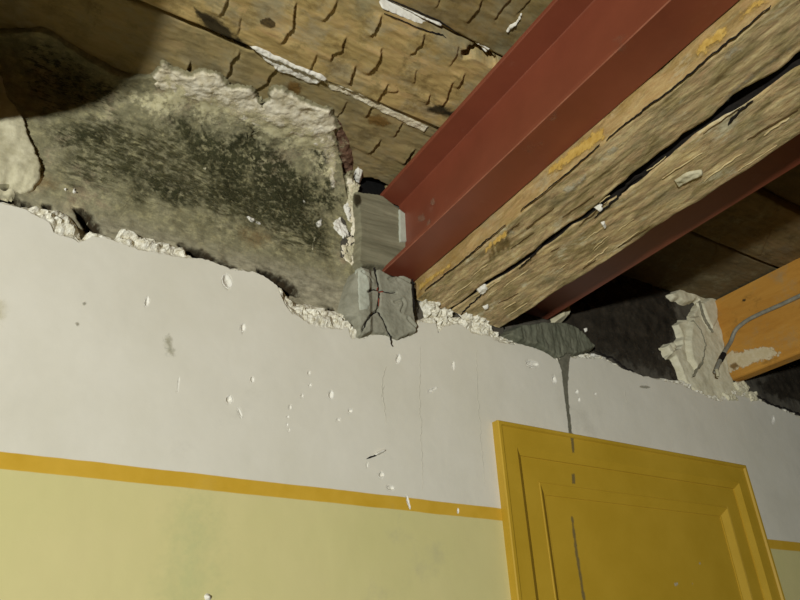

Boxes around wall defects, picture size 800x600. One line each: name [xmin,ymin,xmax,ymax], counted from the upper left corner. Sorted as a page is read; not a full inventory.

water stain [28,45,343,256]
flaking render [0,26,372,339]
crack [362,267,415,346]
flaking render [411,281,551,345]
flaking render [669,302,694,320]
flaking render [570,331,800,424]